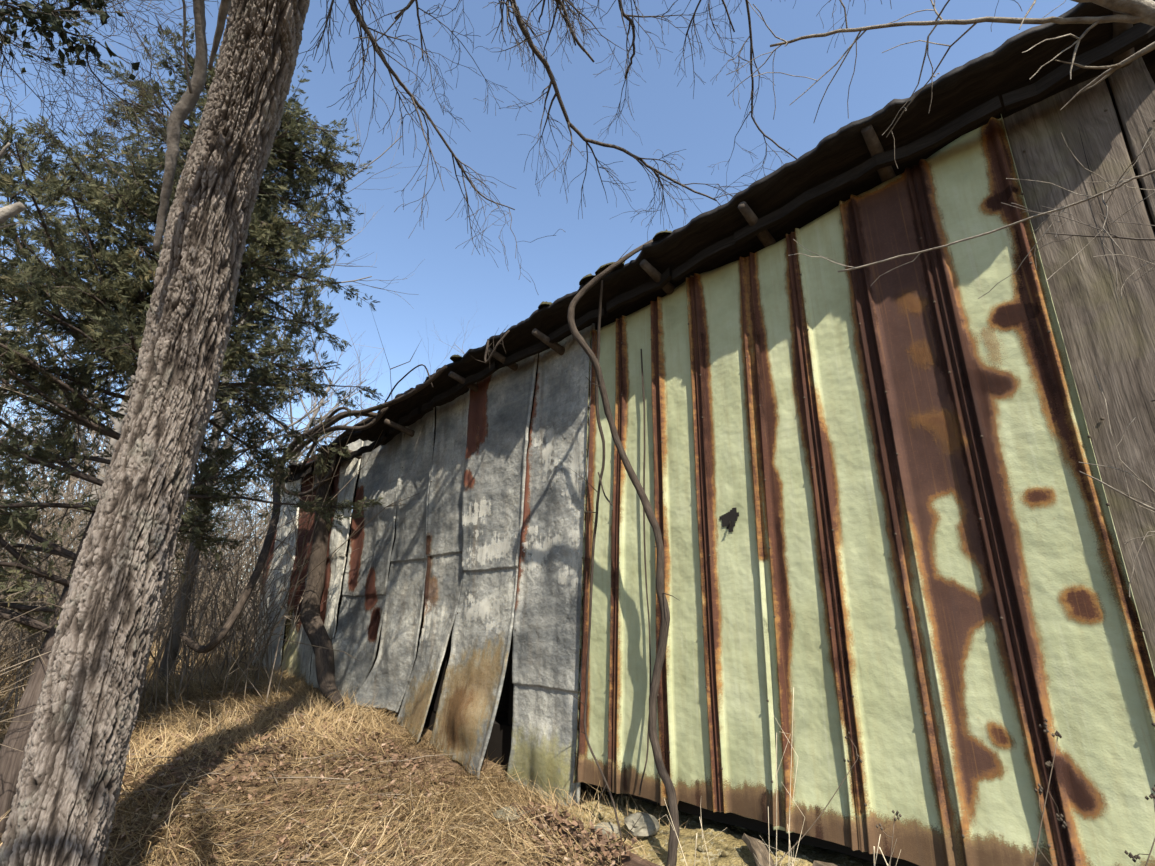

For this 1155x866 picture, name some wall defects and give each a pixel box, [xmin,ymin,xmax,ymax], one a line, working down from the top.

corrosion [283,456,317,651]
corrosion [320,464,341,624]
corrosion [348,486,381,642]
corrosion [464,375,492,490]
corrosion [573,117,1155,866]